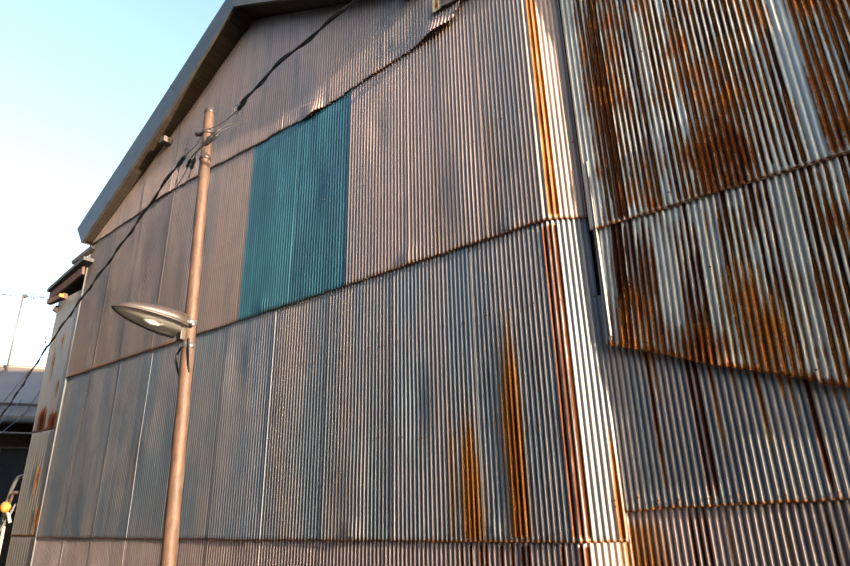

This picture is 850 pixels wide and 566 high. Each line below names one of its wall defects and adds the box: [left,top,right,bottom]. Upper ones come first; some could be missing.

rust [36,407,57,431]
rust [373,0,850,566]